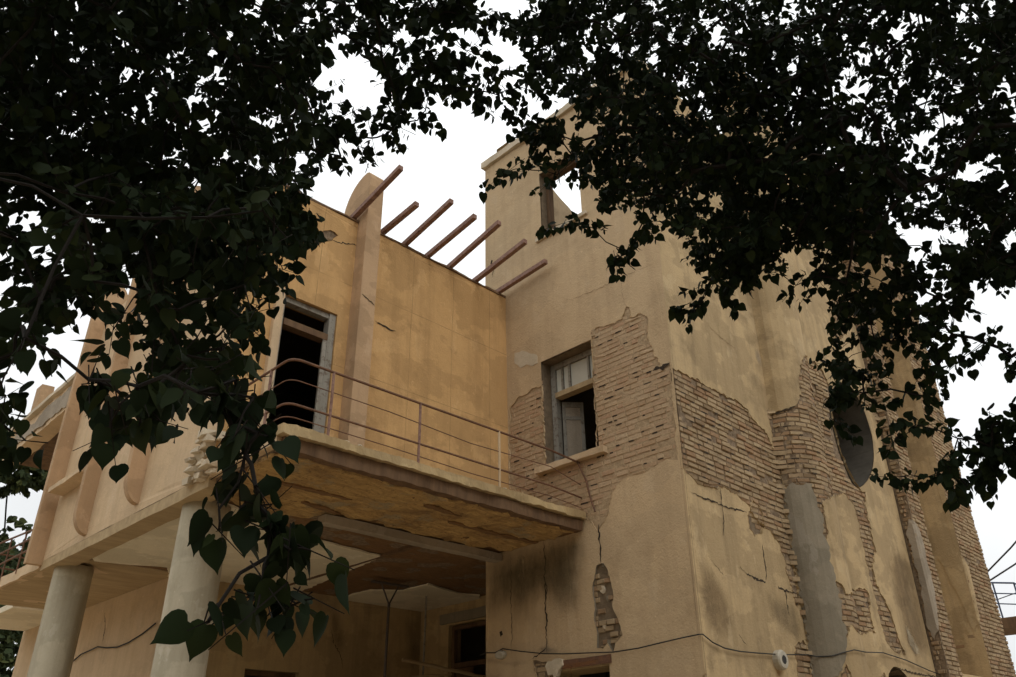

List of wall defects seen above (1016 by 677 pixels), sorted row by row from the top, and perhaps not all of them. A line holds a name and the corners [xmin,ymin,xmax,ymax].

flaking render [508,306,906,655]
crack [510,545,548,658]
flaking render [533,660,549,677]
flaking render [794,640,813,677]